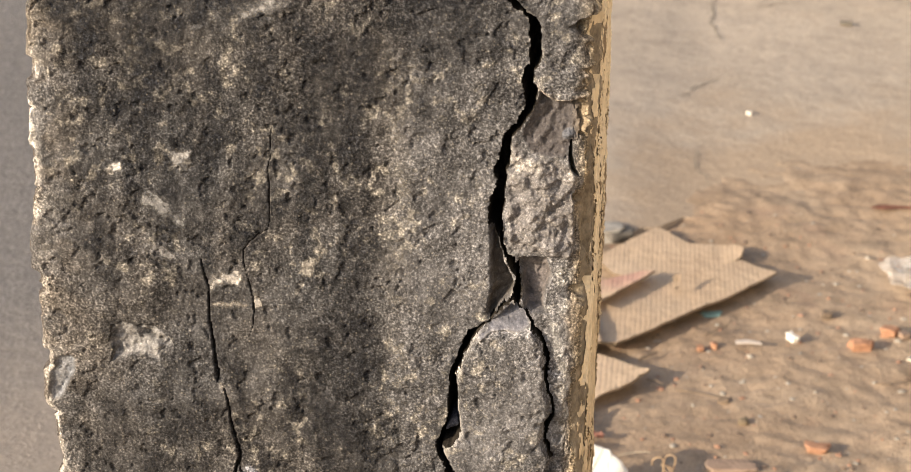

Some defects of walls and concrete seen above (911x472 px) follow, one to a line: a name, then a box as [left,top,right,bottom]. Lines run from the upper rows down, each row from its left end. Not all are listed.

crack [435,0,555,472]
spalling [476,0,613,472]
crack [569,117,589,175]